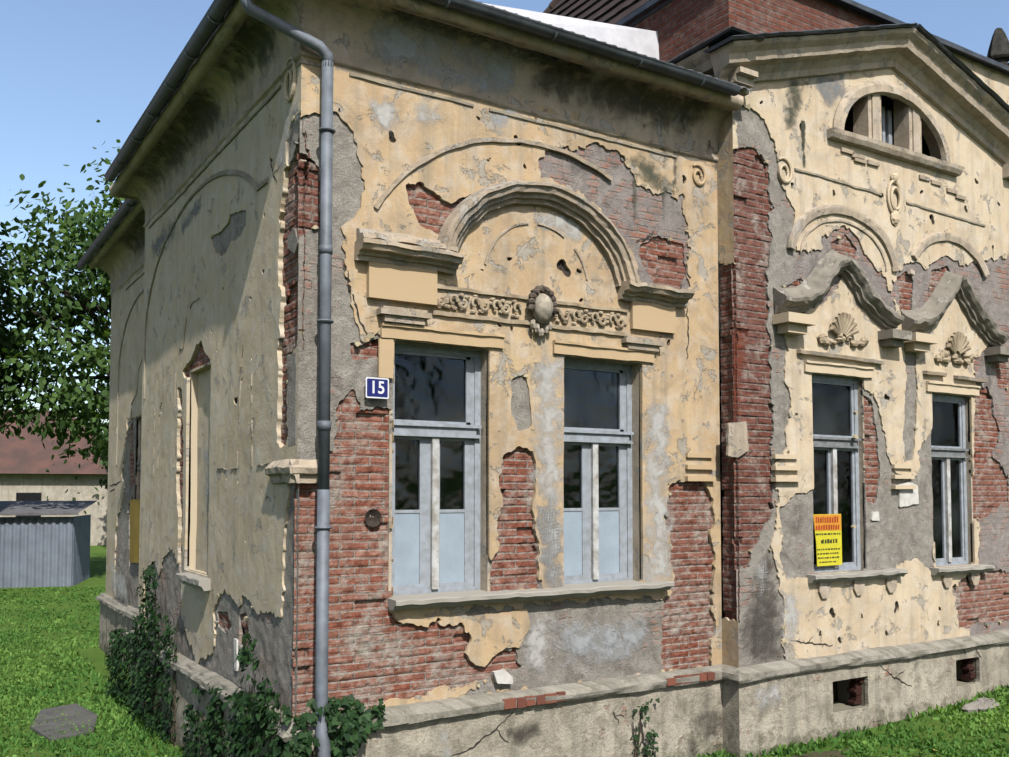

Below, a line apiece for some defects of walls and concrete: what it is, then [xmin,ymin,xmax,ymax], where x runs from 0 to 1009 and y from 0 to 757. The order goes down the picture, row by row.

flaking render [210,211,246,256]
flaking render [186,344,210,377]
flaking render [271,101,1009,710]
flaking render [111,389,318,717]
crack [450,712,513,757]